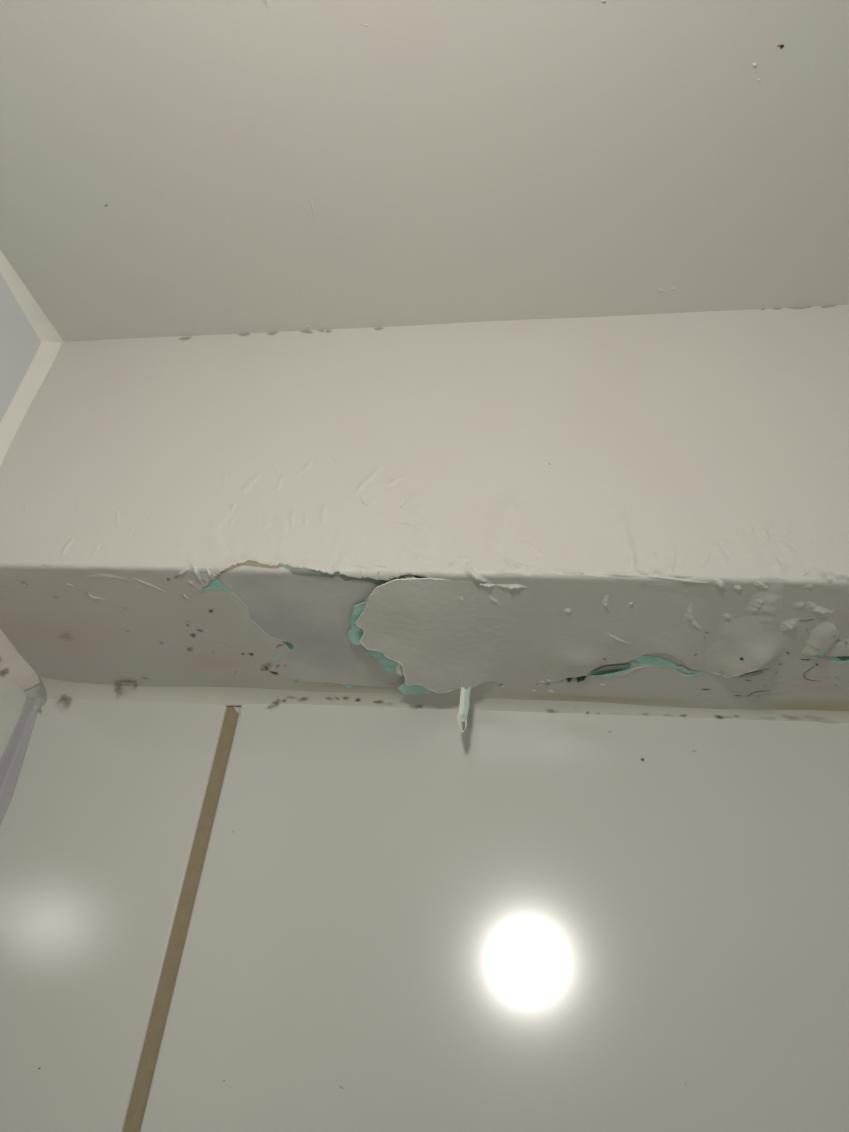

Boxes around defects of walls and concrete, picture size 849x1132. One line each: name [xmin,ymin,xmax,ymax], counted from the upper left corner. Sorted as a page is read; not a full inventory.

leakage [0,584,402,704]
peeling [193,551,425,688]
leakage [429,664,849,718]
peeling [704,581,849,678]